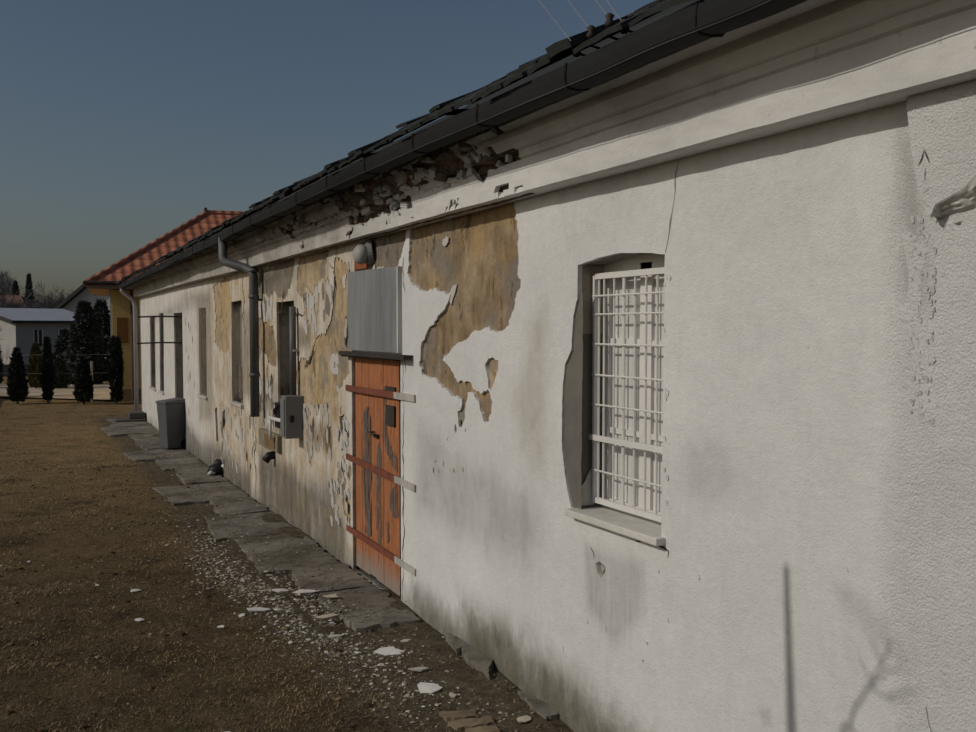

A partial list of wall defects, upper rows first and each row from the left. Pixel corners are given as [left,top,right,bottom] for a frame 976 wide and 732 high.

spalling [338,183,386,224]
spalling [406,153,466,195]
crack [665,161,679,253]
flaking render [214,277,231,352]
flaking render [217,202,521,546]
leakage [472,620,607,732]